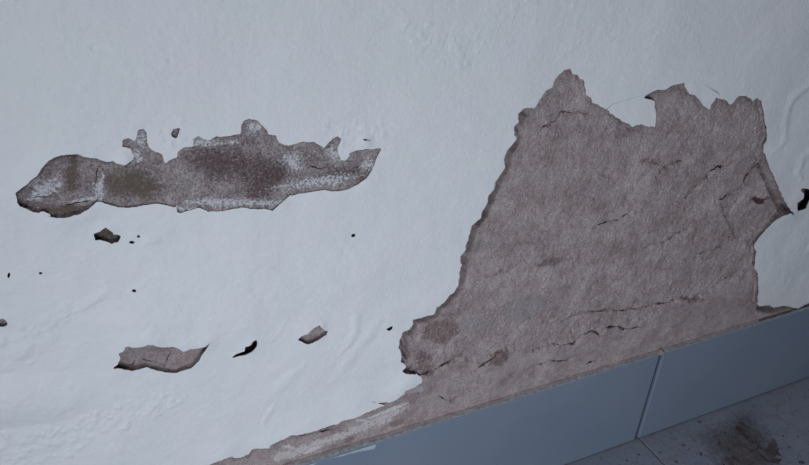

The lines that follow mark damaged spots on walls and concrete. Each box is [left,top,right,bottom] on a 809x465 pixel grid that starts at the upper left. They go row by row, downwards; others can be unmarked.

peeling [16,119,381,217]
peeling [94,228,120,243]
flaking render [210,69,809,465]